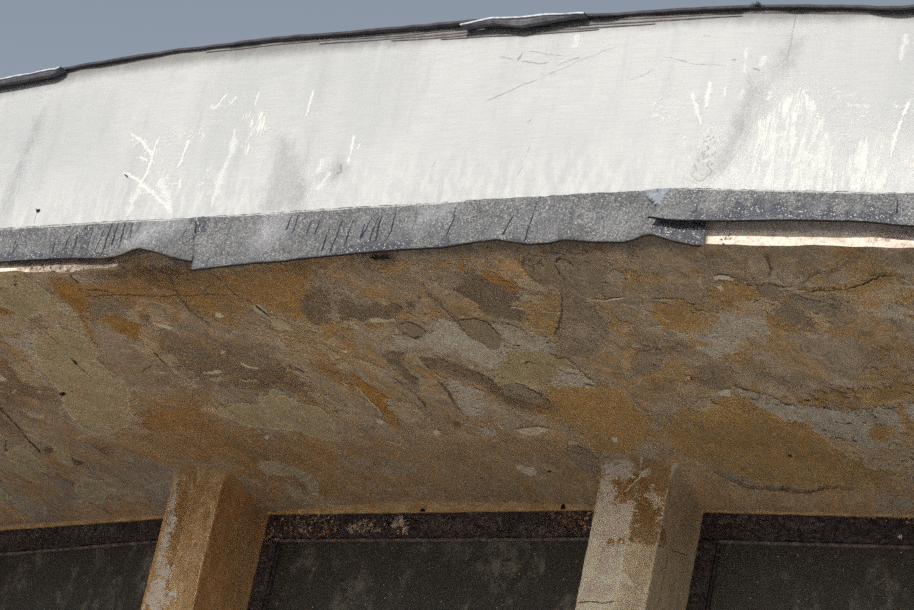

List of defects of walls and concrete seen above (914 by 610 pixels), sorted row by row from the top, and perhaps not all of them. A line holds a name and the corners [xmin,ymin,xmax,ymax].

damp [124,122,205,210]
damp [651,82,914,244]
damp [306,208,417,254]
damp [502,201,537,242]
crack [764,256,906,292]
crack [59,268,251,327]
crack [0,408,41,454]
peeling [0,251,914,610]
crack [714,472,855,494]